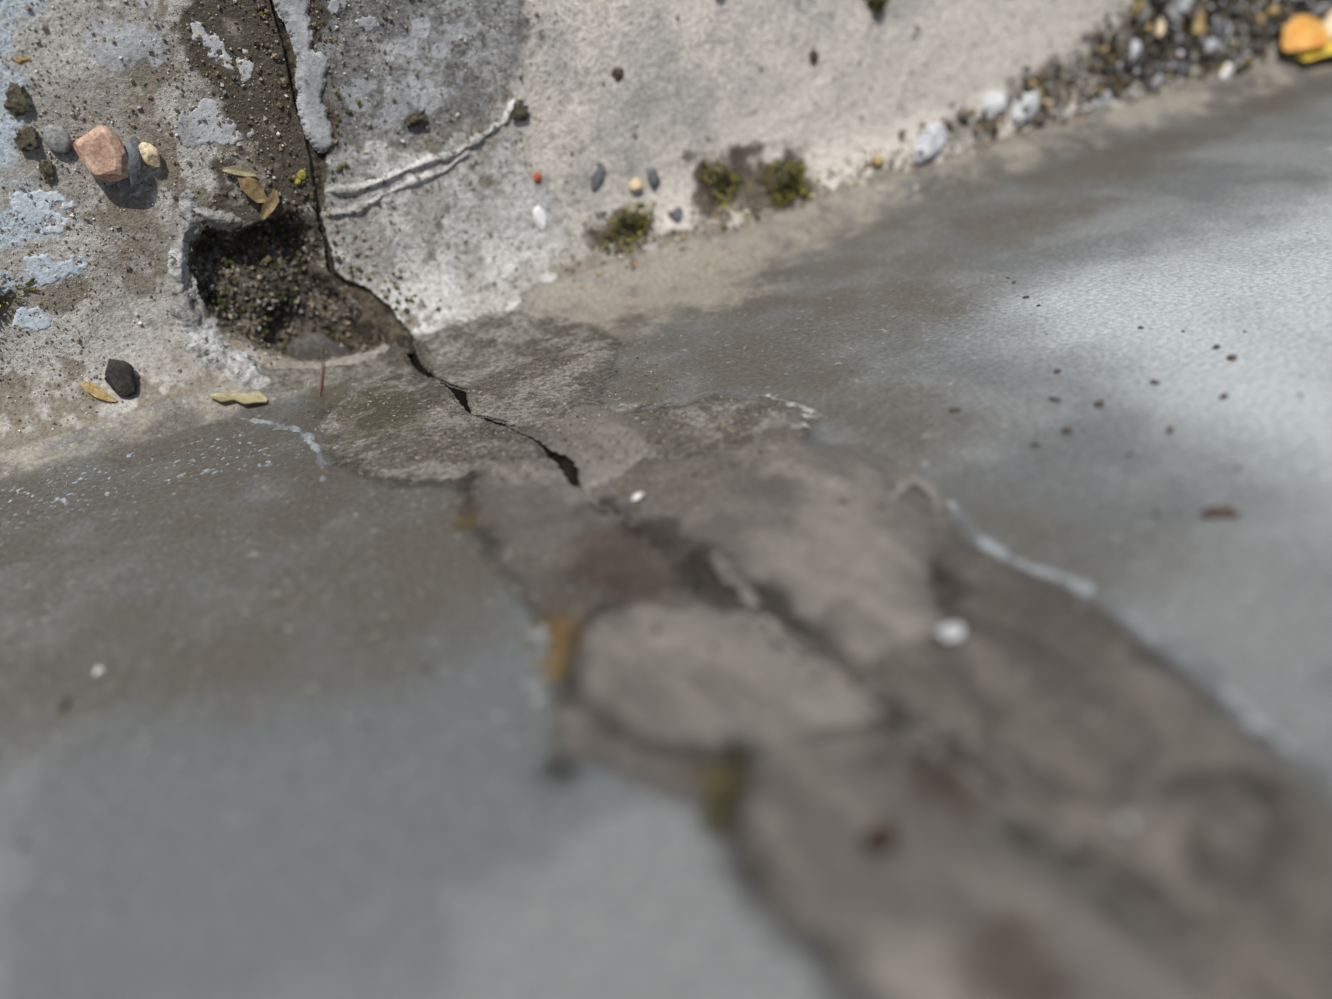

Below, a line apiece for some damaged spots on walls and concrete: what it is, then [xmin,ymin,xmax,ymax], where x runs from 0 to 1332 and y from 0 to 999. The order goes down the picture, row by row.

peeling [81,0,165,72]
peeling [190,21,254,82]
peeling [273,0,494,153]
peeling [157,98,259,149]
spalling [188,206,385,363]
peeling [396,340,437,378]
crack [269,0,813,657]
peeling [439,387,481,410]